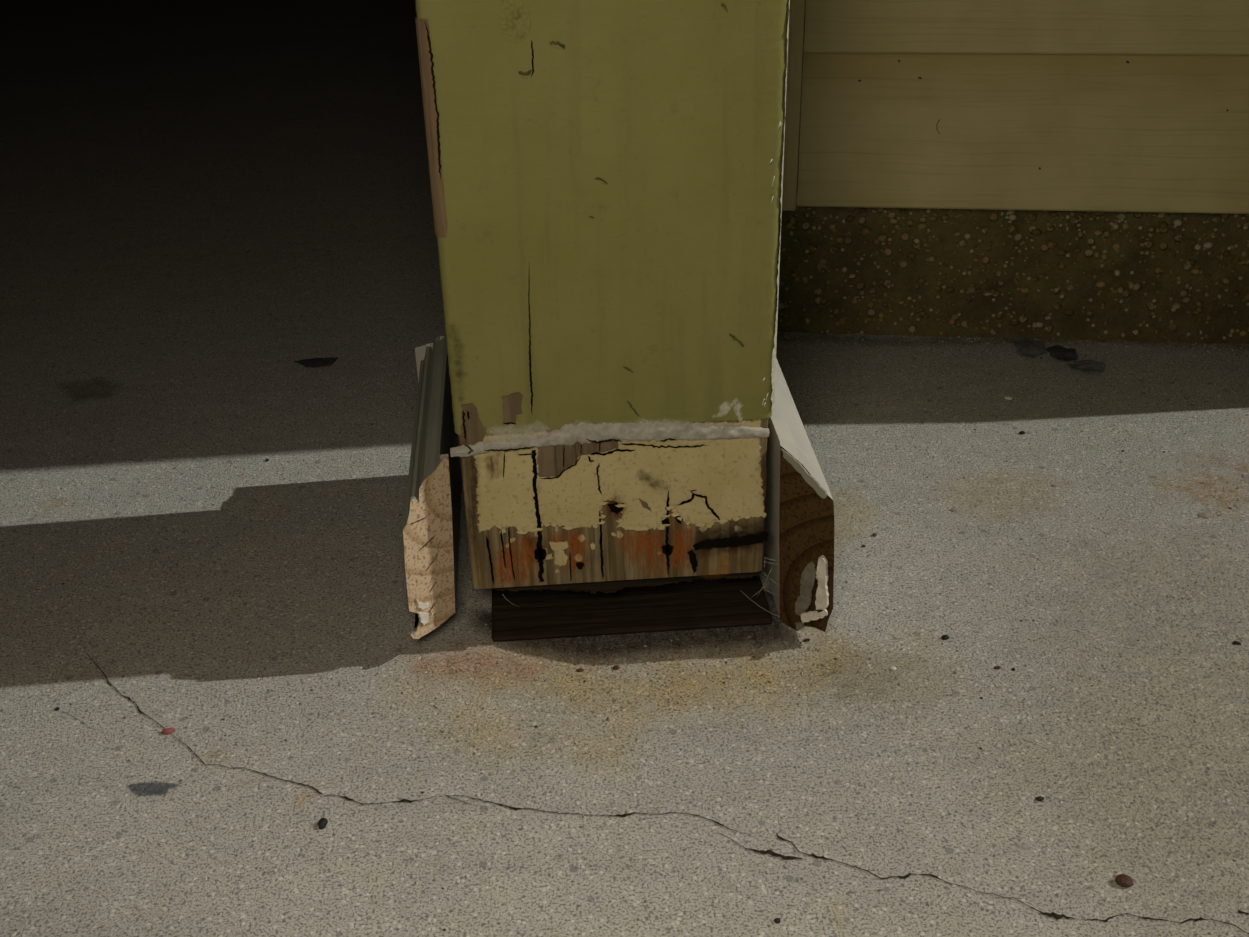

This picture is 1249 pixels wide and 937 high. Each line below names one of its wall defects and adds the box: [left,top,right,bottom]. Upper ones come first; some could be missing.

crack [526,270,534,412]
peeling [549,540,568,566]
peeling [537,440,619,479]
crack [464,438,706,584]
crack [82,645,1249,934]